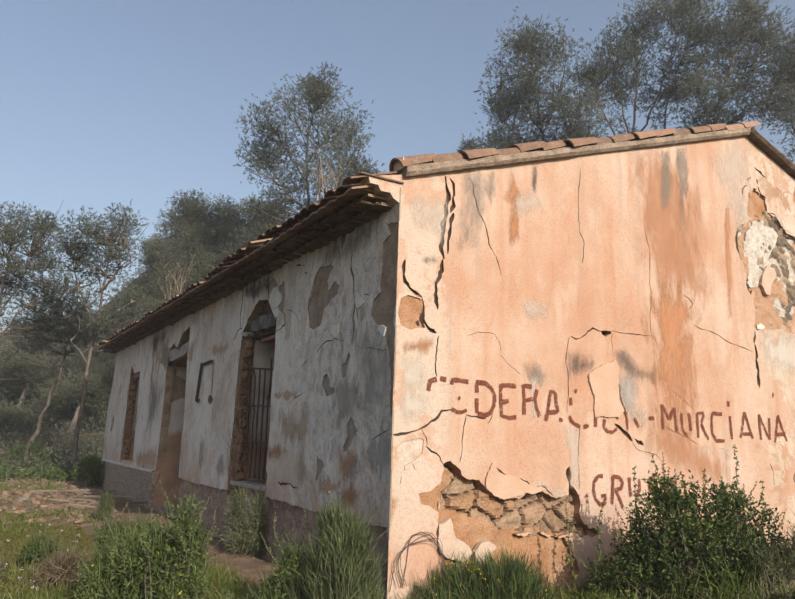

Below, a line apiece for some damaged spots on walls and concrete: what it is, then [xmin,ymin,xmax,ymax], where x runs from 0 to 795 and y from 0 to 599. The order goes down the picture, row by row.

peeling [161,332,190,402]
peeling [308,265,340,329]
peeling [354,222,423,413]
crack [402,184,454,374]
water stain [647,152,696,421]
spalling [737,189,795,335]
peeling [344,418,358,451]
crack [615,412,653,454]
spalling [419,463,595,592]